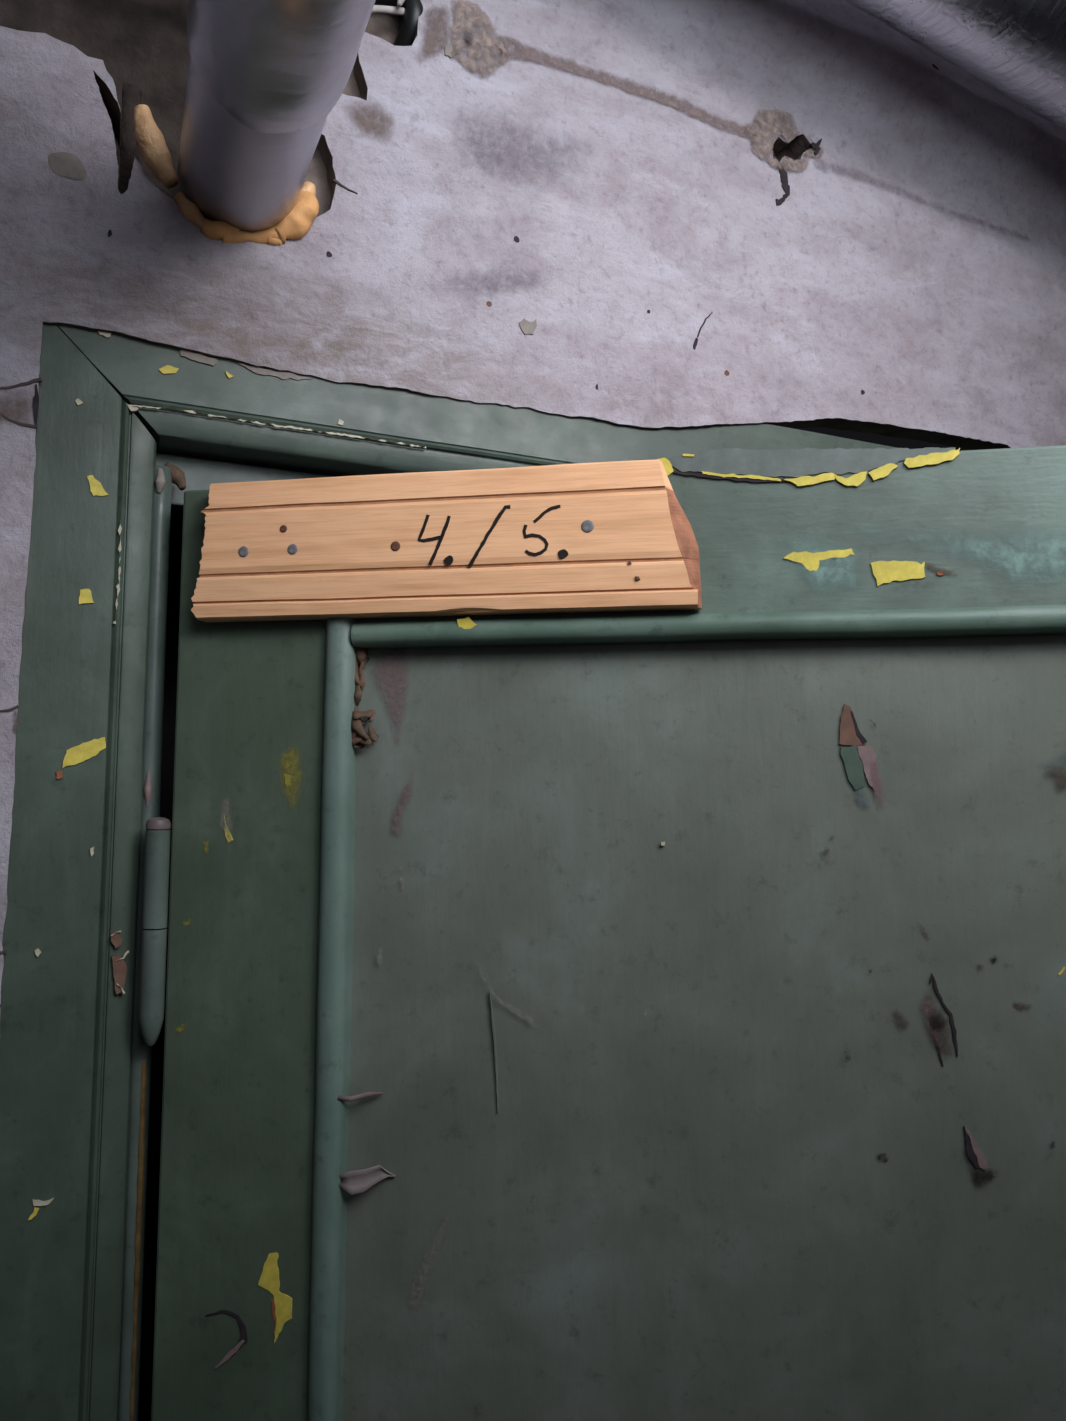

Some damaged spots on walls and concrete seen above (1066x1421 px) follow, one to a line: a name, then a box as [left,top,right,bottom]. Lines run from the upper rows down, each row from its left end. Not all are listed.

spalling [365,13,403,44]
spalling [0,0,189,200]
spalling [342,68,362,99]
spalling [773,148,796,161]
spalling [303,149,331,217]
peeling [659,447,960,487]
peeling [783,545,855,587]
peeling [870,561,952,586]
peeling [952,536,1066,578]
spalling [839,704,883,806]
peeling [339,1165,396,1195]
peeling [258,1253,292,1344]